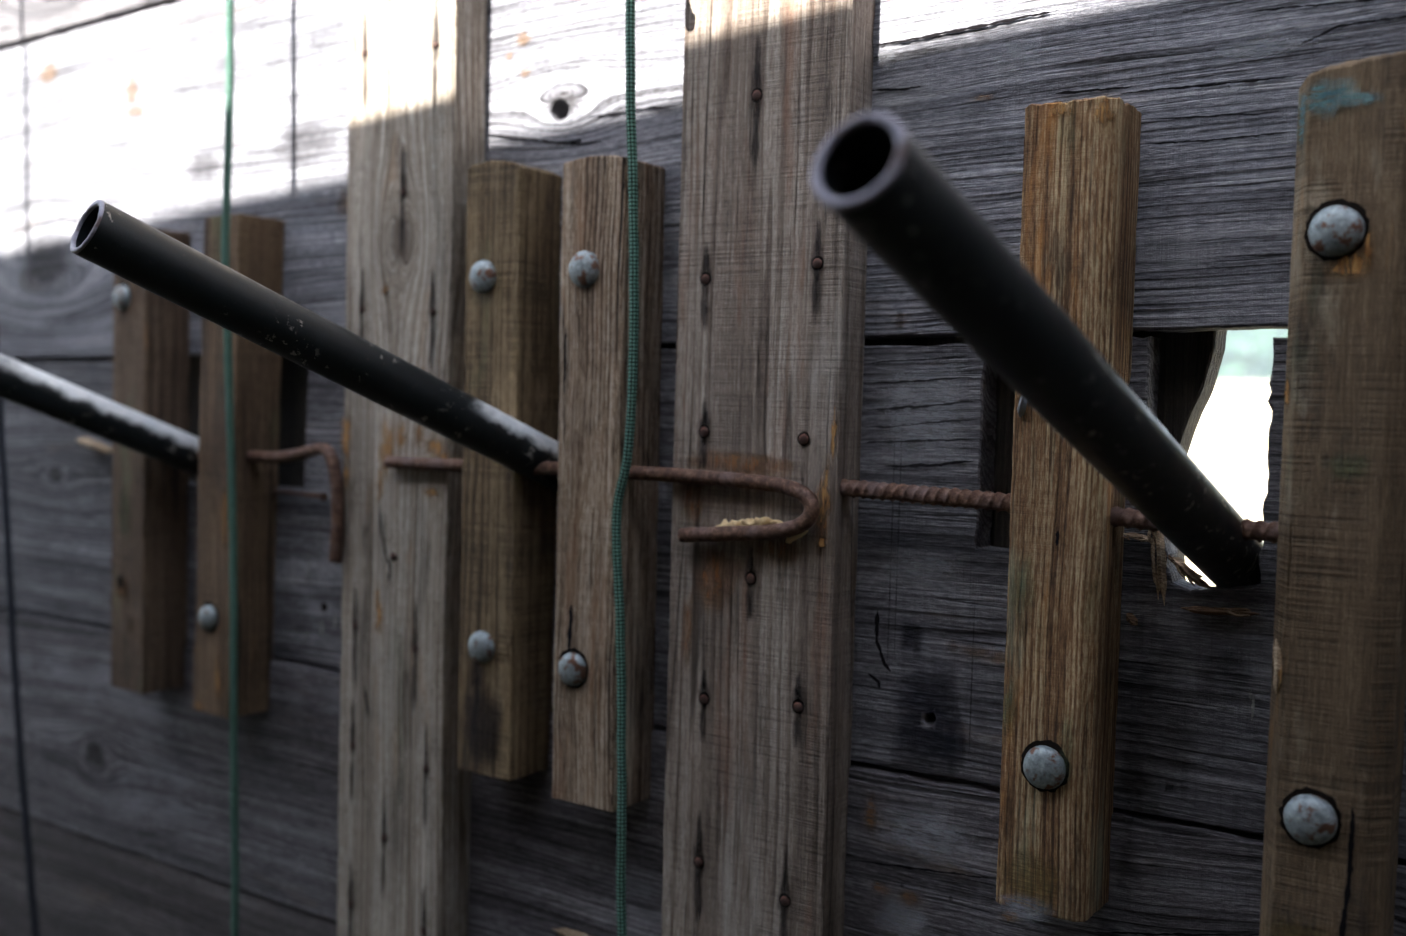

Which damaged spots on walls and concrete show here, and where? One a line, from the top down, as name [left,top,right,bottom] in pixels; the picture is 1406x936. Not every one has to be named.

corrosion [384,456,462,472]
corrosion [533,461,558,476]
corrosion [246,443,344,563]
corrosion [628,465,820,542]
corrosion [840,478,1011,514]
corrosion [1110,506,1159,532]
corrosion [1241,518,1279,544]